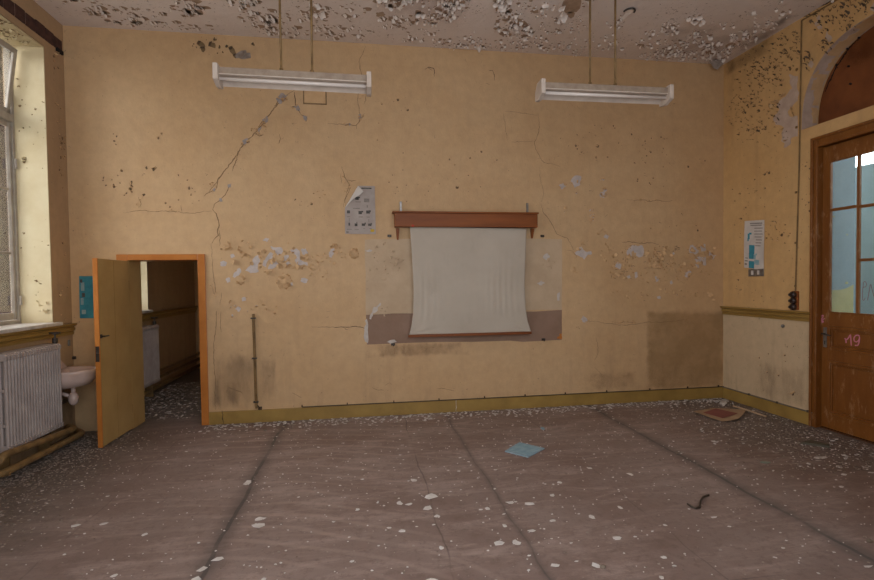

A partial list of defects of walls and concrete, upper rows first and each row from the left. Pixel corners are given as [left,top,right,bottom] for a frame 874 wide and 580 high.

peeling [62,0,236,58]
peeling [226,0,594,53]
crack [131,91,307,424]
peeling [220,238,359,289]
peeling [575,229,719,301]